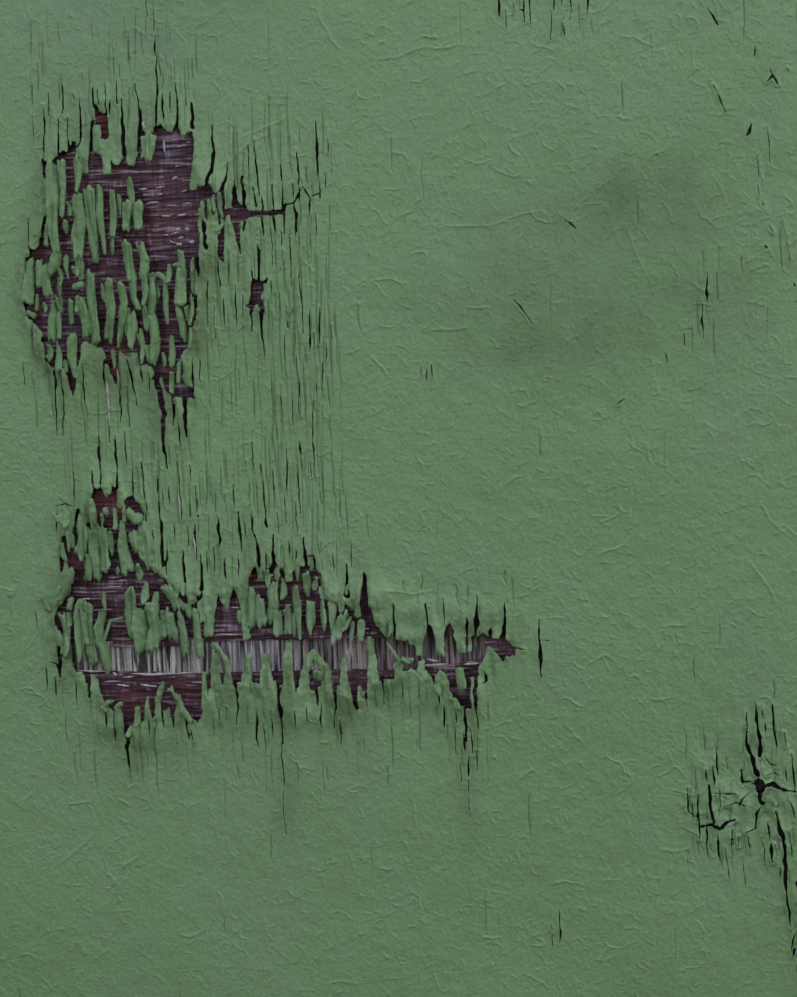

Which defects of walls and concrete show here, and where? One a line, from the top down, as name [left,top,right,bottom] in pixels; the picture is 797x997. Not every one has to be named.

crack [498,0,589,40]
peeling [21,41,524,813]
crack [538,622,550,677]
crack [687,703,797,956]